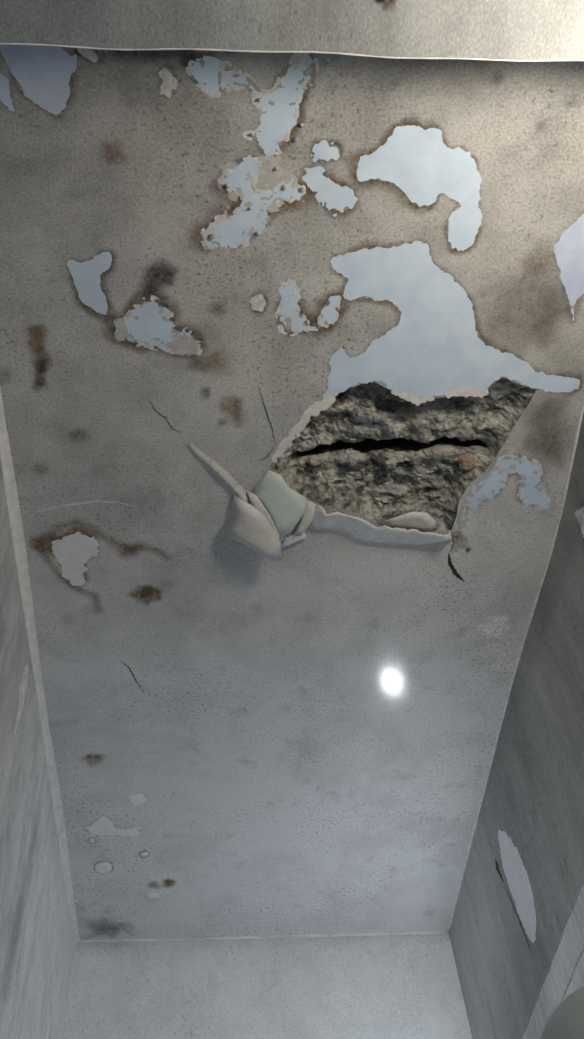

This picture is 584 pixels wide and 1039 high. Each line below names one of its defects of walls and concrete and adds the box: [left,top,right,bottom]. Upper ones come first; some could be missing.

peeling [0,45,102,115]
peeling [159,53,483,257]
peeling [554,213,584,321]
peeling [67,252,204,357]
corrosion [29,326,50,385]
spalling [225,241,581,561]
peeling [37,523,102,587]
crack [448,535,465,582]
peeling [574,505,584,537]
corrosion [132,587,160,603]
peeling [495,830,536,953]